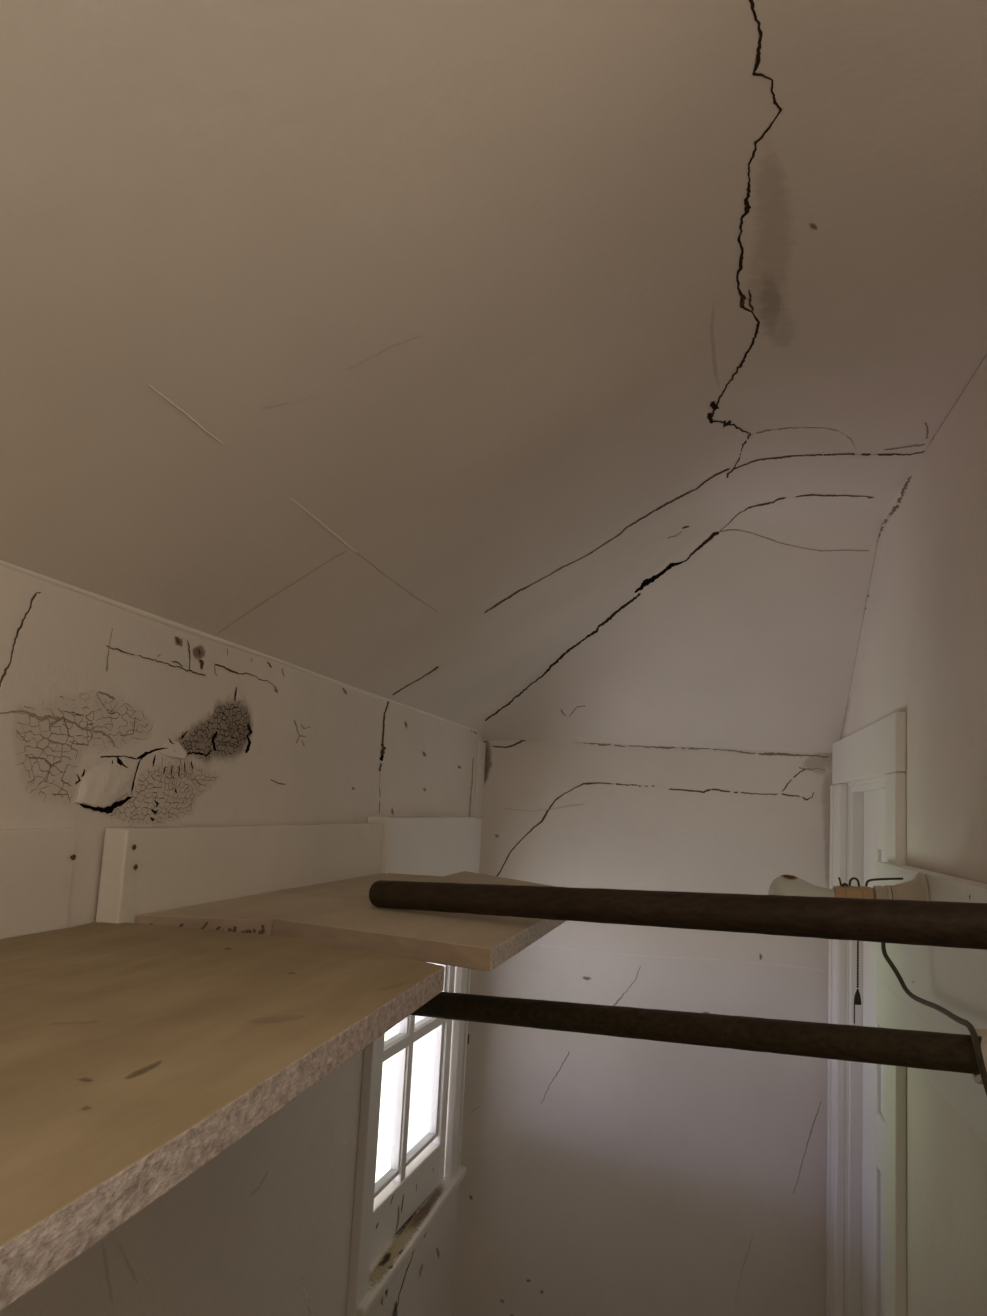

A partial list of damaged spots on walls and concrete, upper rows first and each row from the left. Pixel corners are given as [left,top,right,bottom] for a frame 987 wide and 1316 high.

crack [469,0,986,877]
crack [0,592,284,826]
crack [379,666,439,813]